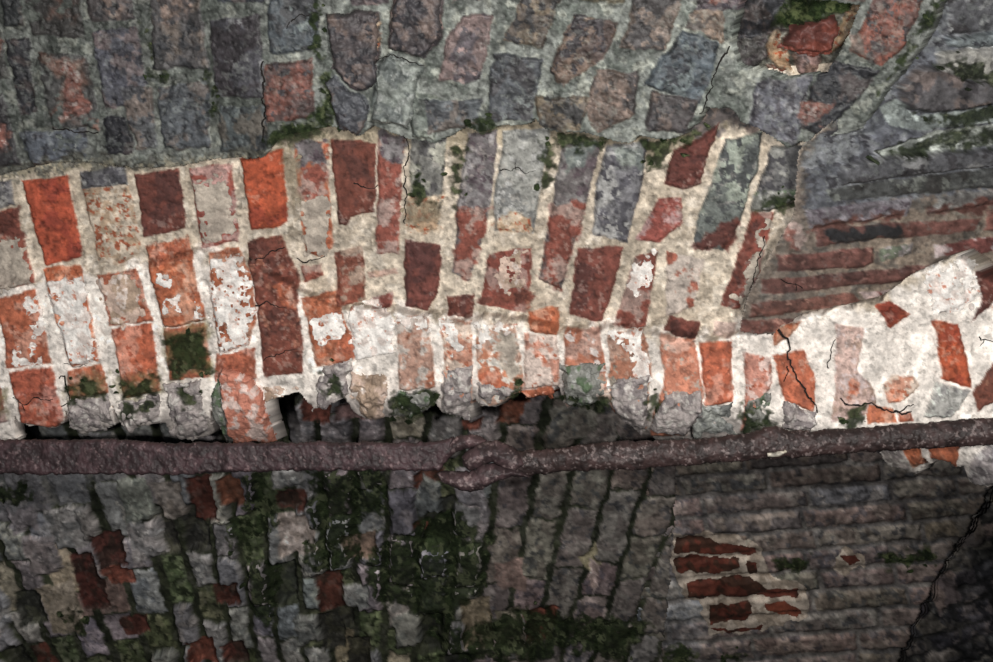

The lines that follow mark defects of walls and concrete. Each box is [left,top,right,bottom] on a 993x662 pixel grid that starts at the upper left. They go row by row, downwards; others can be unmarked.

spalling [737,0,860,74]
peeling [729,218,773,309]
peeling [924,255,982,315]
peeling [309,298,771,439]
spalling [782,401,817,431]
crack [901,489,993,662]